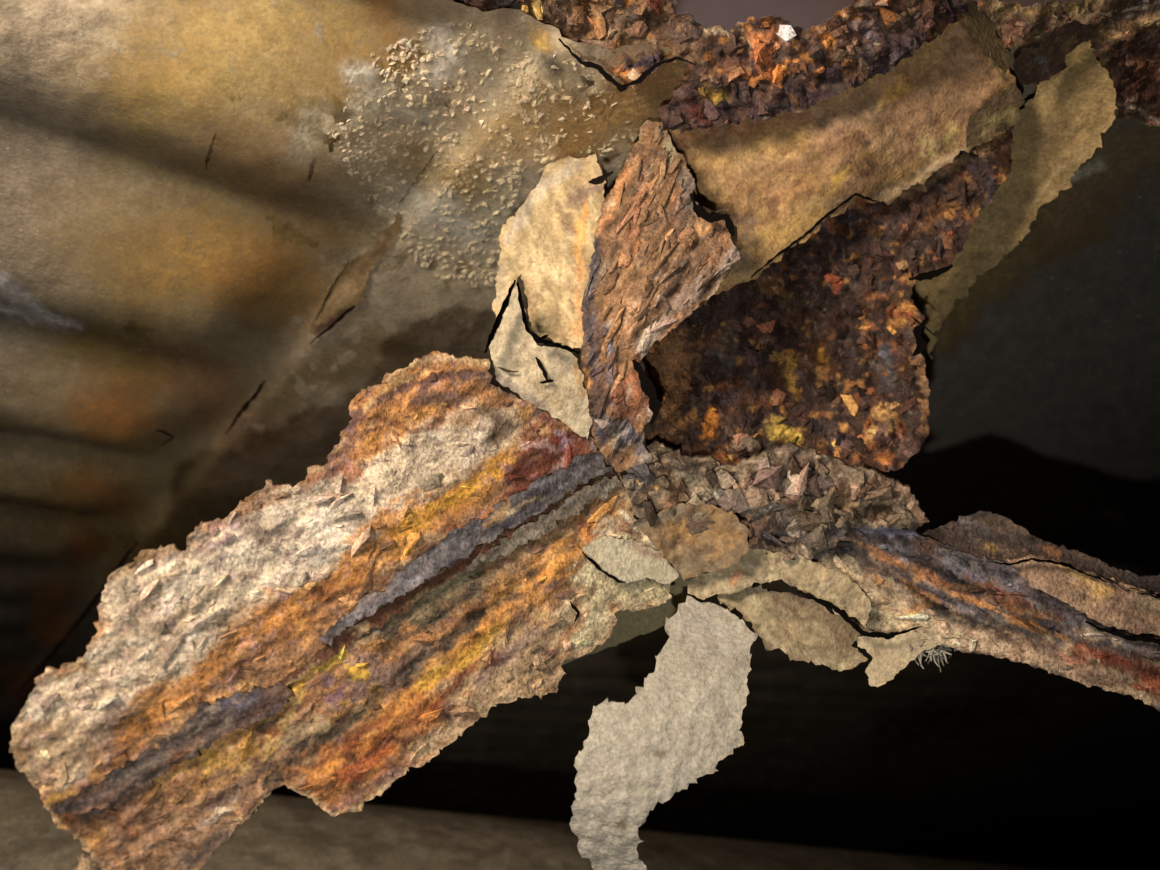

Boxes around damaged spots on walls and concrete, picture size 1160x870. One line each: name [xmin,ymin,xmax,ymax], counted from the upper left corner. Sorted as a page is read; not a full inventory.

crack [205,134,216,170]
crack [308,159,316,181]
peeling [308,22,645,438]
rust [455,0,1013,473]
peeling [668,0,1024,296]
rust [934,0,1160,355]
crack [225,380,265,434]
crack [14,541,139,695]
rust [9,351,680,870]
peeling [569,584,868,870]
rust [810,510,1160,712]